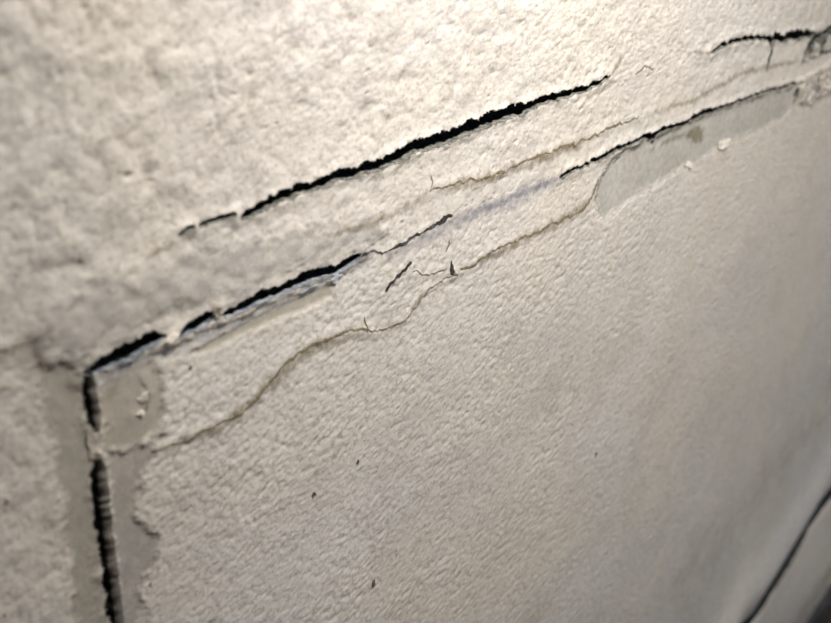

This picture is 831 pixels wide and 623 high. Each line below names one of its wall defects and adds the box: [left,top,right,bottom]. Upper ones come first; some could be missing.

crack [711,28,816,70]
spalling [802,25,831,64]
peeling [595,65,831,219]
peeling [97,362,162,448]
crack [80,59,800,623]
peeling [36,366,104,623]